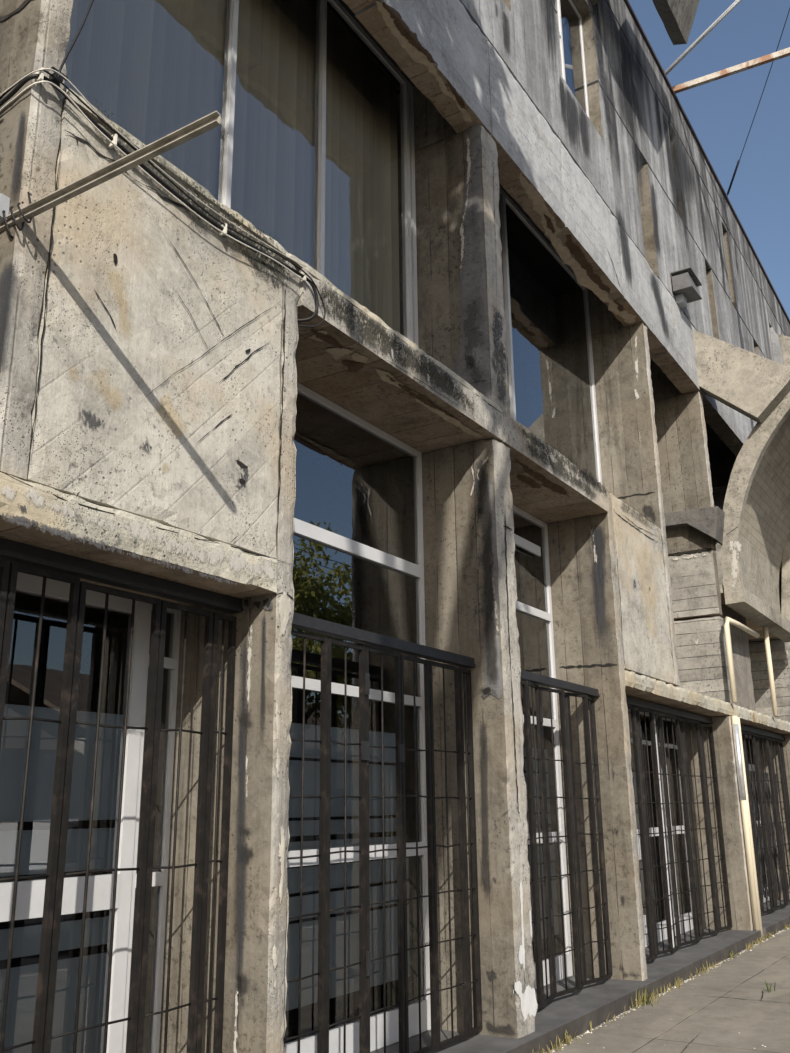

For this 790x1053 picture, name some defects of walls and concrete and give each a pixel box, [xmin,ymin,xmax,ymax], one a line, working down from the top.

peeling [369,0,473,122]
leakage [543,0,556,56]
leakage [560,77,589,154]
leakage [588,0,660,251]
peeling [460,138,471,273]
peeling [519,173,636,323]
leakage [618,212,632,281]
leakage [652,275,668,334]
leakage [655,95,738,290]
leakage [322,300,490,432]
peeling [519,881,532,969]
peeling [513,981,538,1021]